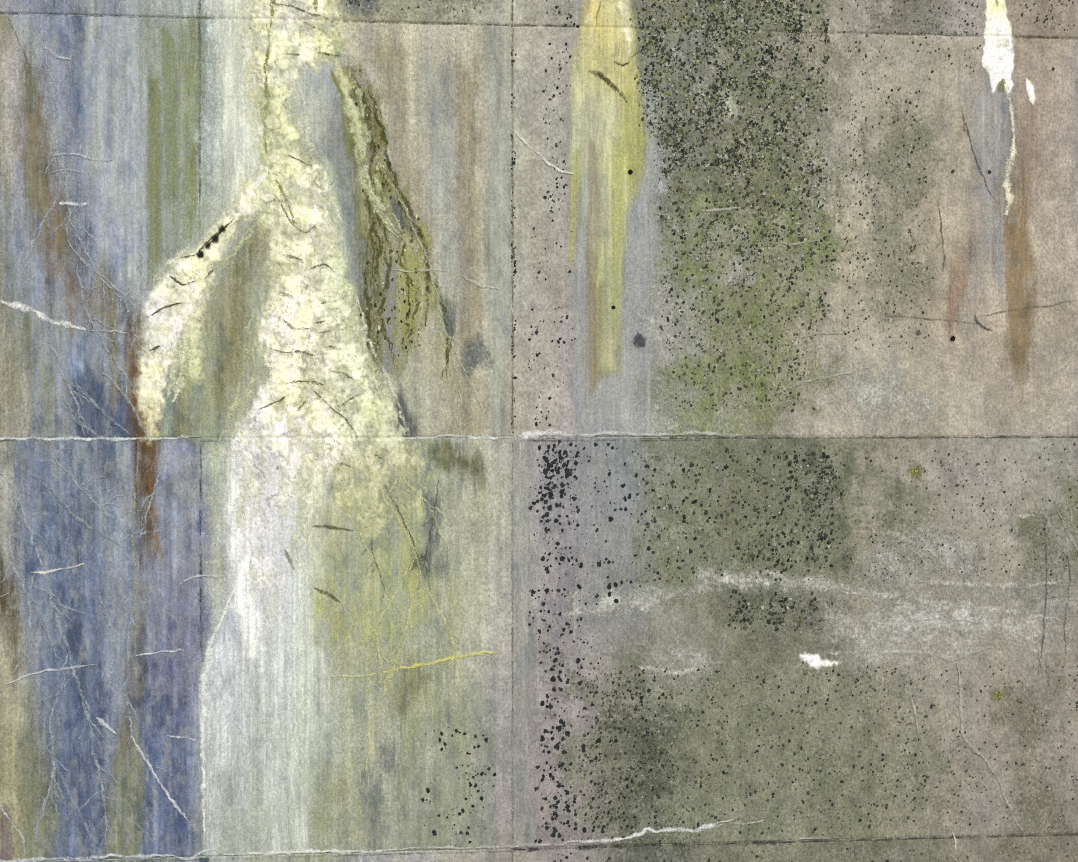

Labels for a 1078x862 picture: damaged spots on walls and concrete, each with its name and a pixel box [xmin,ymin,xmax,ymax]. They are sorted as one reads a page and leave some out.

corrosion [24,67,159,555]
leakage [0,0,438,862]
crack [0,29,763,862]
leakage [445,300,455,335]
leakage [567,0,658,561]
spalling [556,522,1078,674]
corrosion [1006,113,1033,372]
crack [1034,510,1078,677]